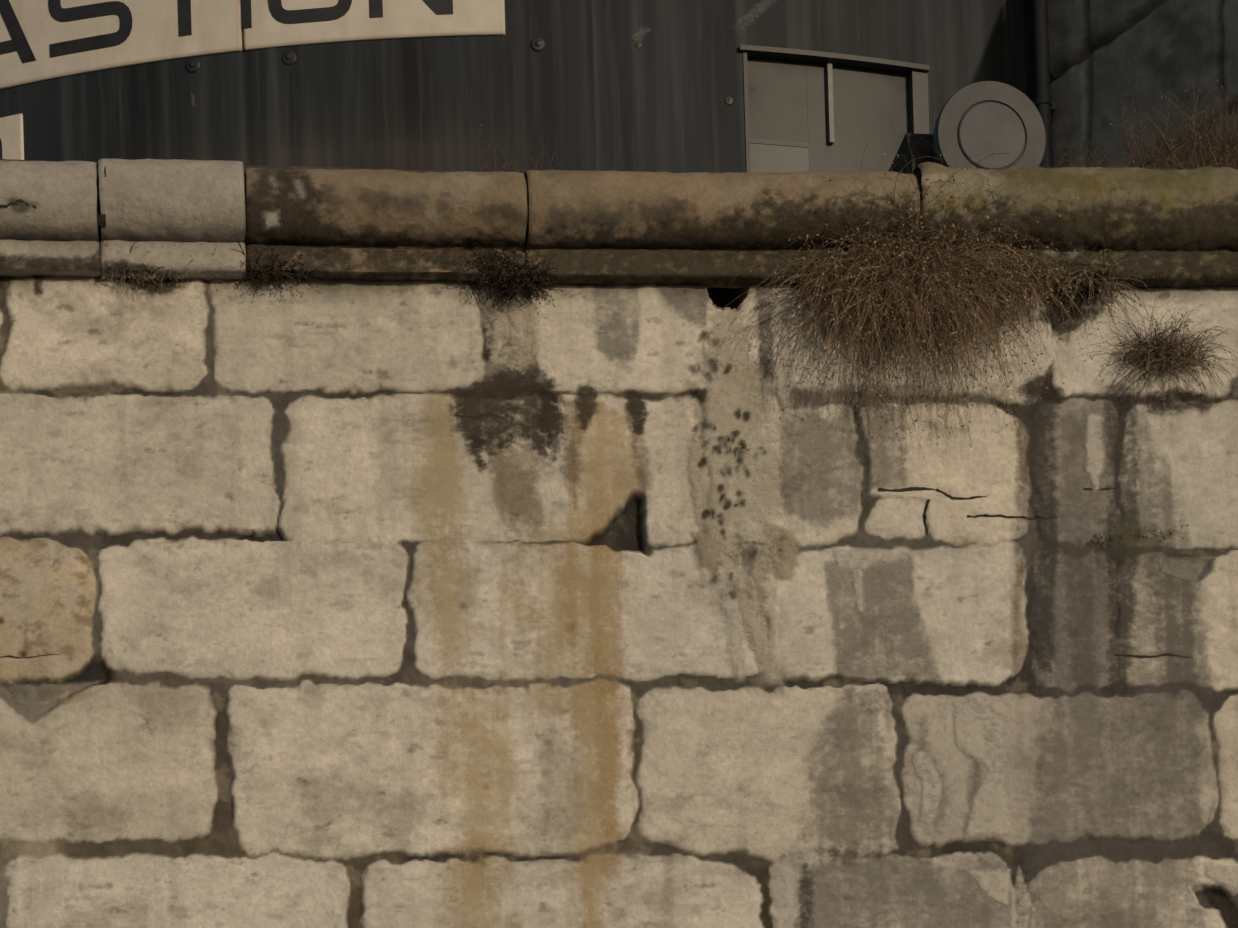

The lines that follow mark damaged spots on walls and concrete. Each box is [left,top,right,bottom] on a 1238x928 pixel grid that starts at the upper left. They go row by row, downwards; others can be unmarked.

leakage [246,167,1238,693]
spalling [587,496,645,554]
crack [878,487,1055,535]
crack [2,652,59,660]
spalling [1195,862,1238,928]